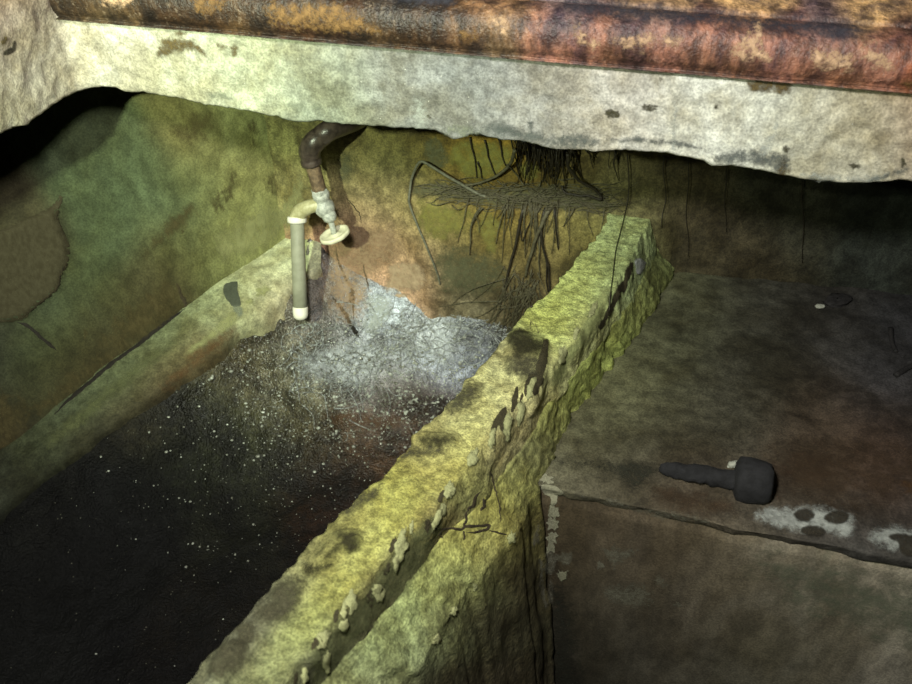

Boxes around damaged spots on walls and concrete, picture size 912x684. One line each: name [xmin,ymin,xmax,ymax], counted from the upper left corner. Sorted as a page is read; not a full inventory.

rust [190,0,226,15]
rust [263,1,381,34]
rust [157,31,205,56]
rust [621,33,652,48]
rust [732,21,771,63]
rust [811,50,852,71]
rust [861,42,894,71]
water stain [622,137,702,149]
water stain [715,136,789,175]
efflorescence [756,507,853,536]
efflorescence [872,527,912,556]